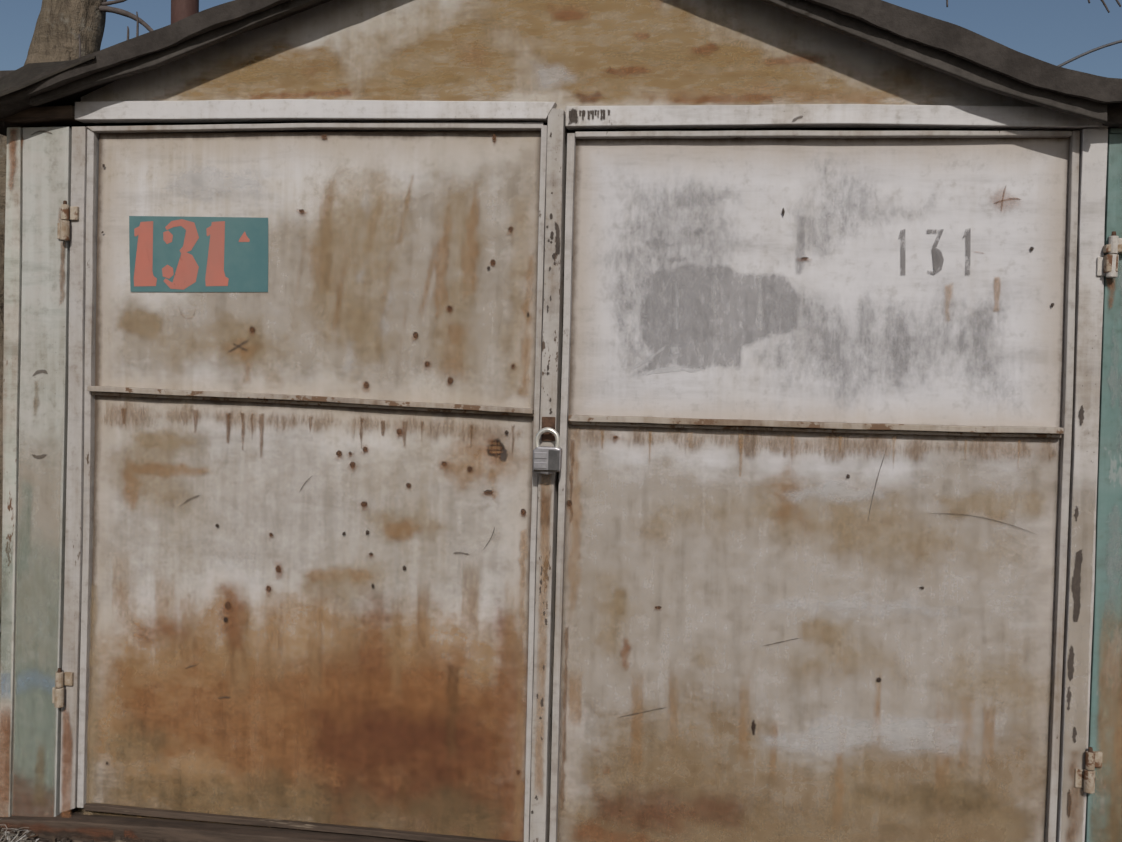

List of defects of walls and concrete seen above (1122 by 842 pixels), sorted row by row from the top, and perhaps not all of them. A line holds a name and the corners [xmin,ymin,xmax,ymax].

rust [178,0,902,105]
peeling [634,230,810,375]
rust [218,413,295,445]
rust [539,489,550,625]
peeling [1071,550,1083,622]
rust [94,591,541,840]
peeling [1067,647,1075,710]